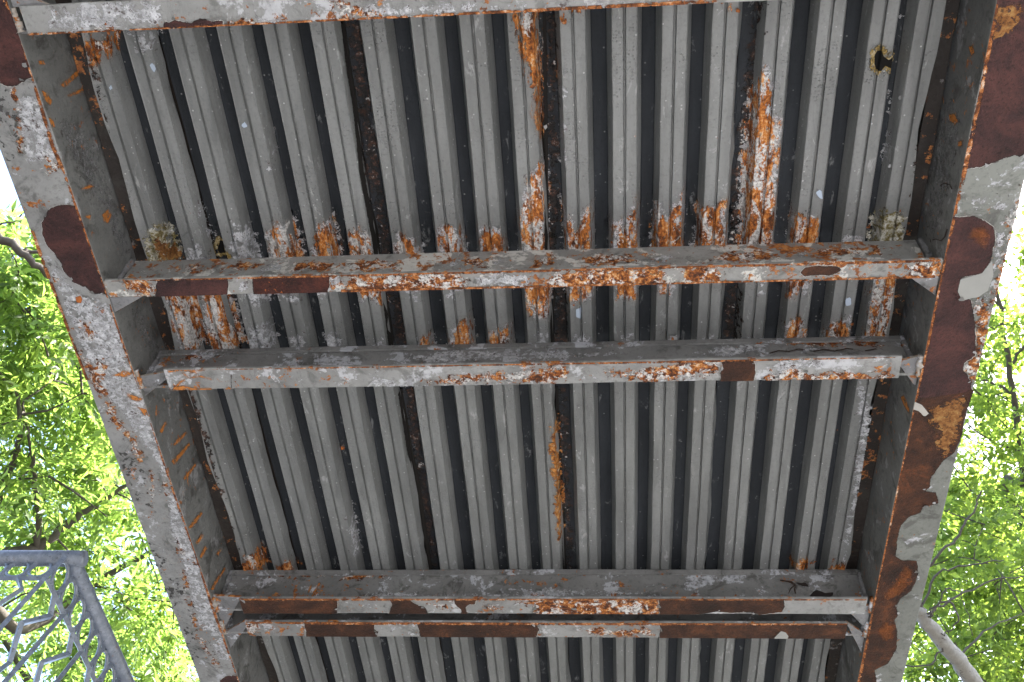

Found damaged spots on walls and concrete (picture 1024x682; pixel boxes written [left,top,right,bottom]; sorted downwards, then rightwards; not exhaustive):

peeling [0,0,61,169]
corrosion [22,47,239,681]
peeling [41,204,231,663]
corrosion [27,0,740,138]
corrosion [124,4,998,402]
corrosion [239,395,914,682]
peeling [857,193,1015,682]
peeling [962,0,1024,170]